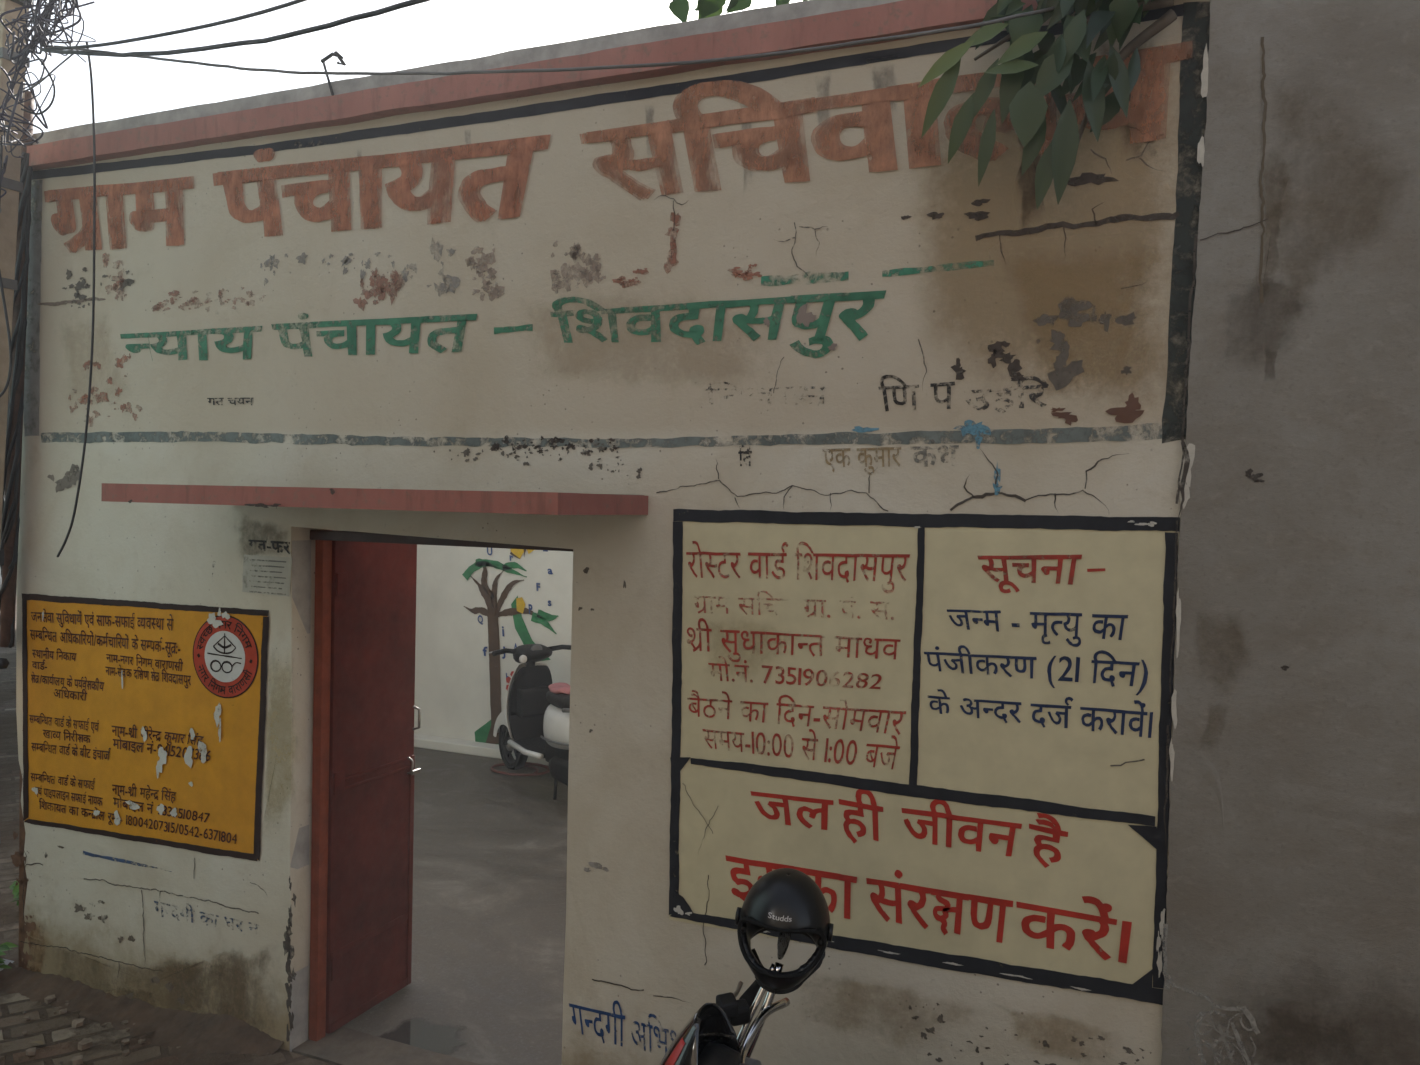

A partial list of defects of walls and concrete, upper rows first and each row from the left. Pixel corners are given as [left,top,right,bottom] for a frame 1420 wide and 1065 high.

peeling [550,212,681,293]
peeling [38,253,134,308]
peeling [151,252,416,311]
peeling [988,341,1026,381]
peeling [1033,297,1136,390]
peeling [1051,407,1078,426]
peeling [1105,393,1144,423]
crack [950,37,1268,858]
crack [656,460,888,511]
peeling [141,726,167,779]
peeling [184,703,221,787]
peeling [93,800,177,825]